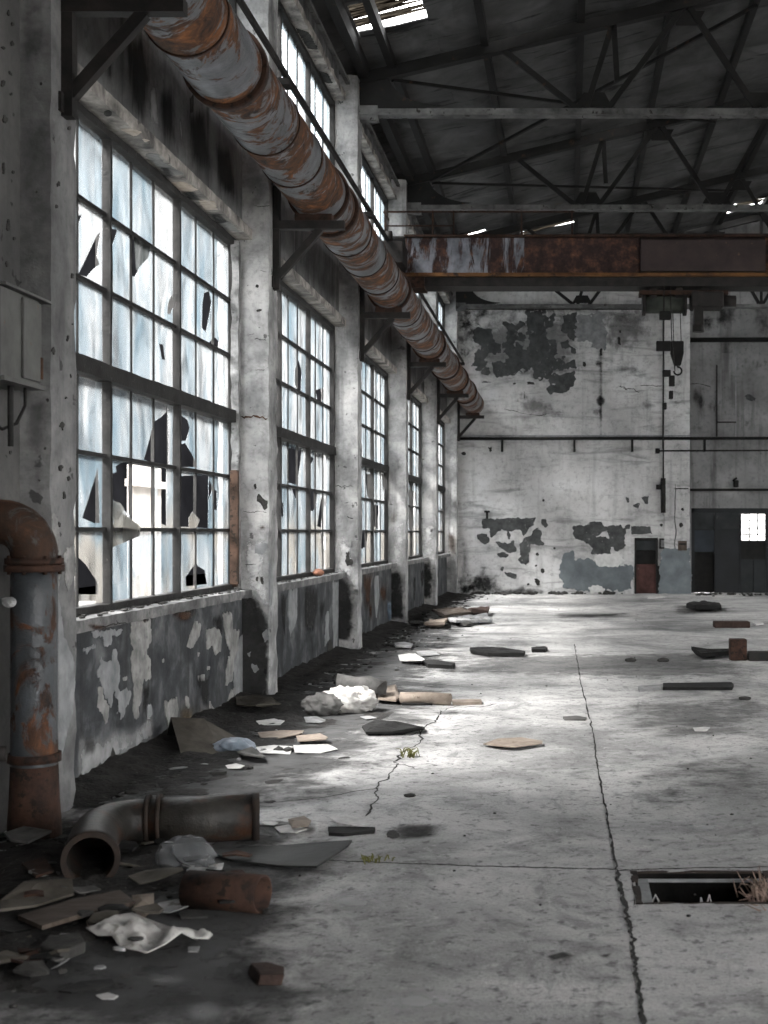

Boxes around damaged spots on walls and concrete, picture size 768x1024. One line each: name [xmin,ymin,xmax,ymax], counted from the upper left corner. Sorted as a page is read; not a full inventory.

peeling [471,310,621,395]
peeling [477,517,663,594]
peeling [51,512,190,753]
peeling [187,611,259,709]
peeling [288,588,297,636]
peeling [324,581,339,652]
crack [280,704,493,816]